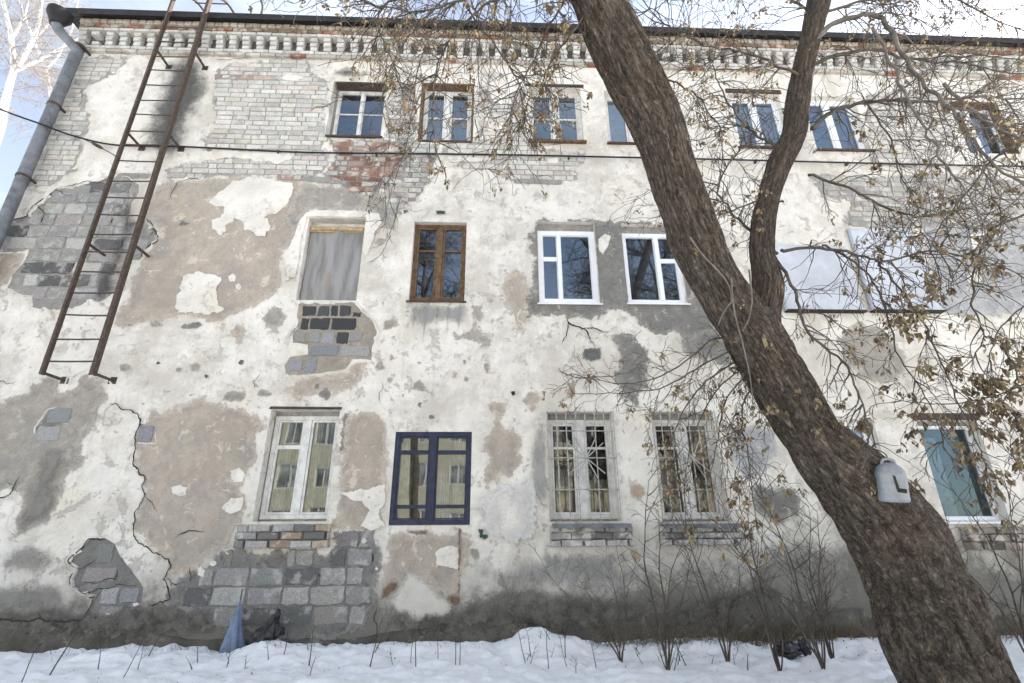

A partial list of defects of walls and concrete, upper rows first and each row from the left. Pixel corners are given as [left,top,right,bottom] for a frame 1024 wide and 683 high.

flaking render [28,54,127,204]
flaking render [114,58,587,348]
water stain [4,548,50,571]
flaking render [0,363,130,543]
crack [0,403,203,627]
water stain [0,587,213,639]
water stain [392,554,644,635]
water stain [762,548,853,608]